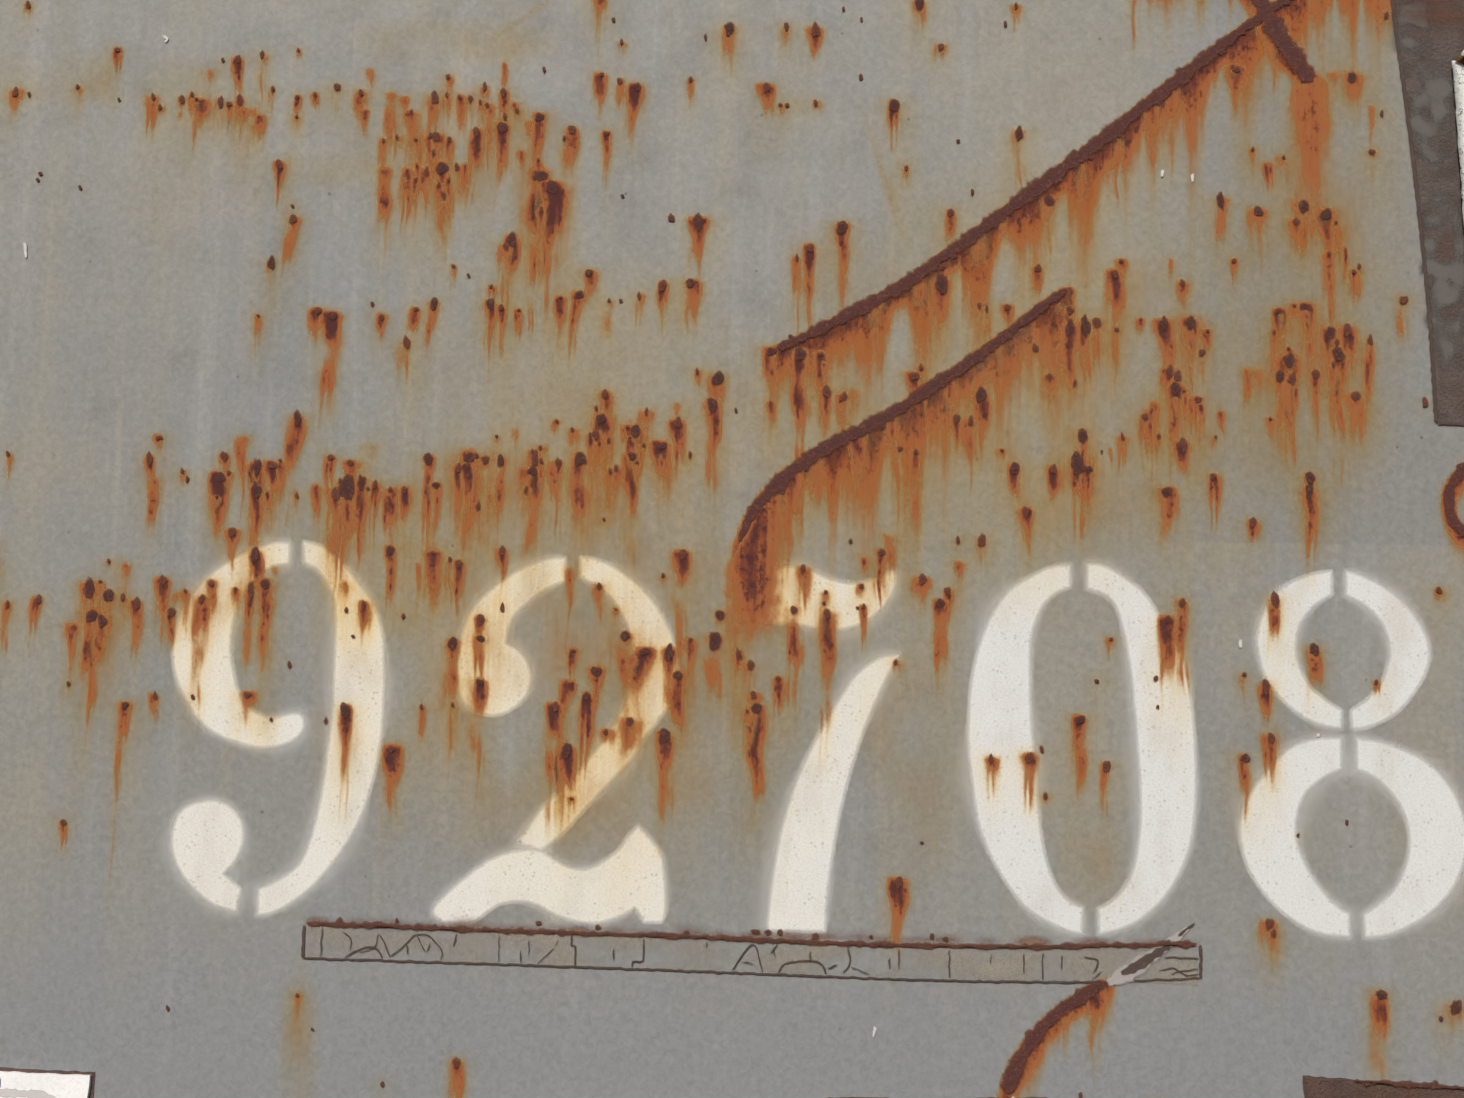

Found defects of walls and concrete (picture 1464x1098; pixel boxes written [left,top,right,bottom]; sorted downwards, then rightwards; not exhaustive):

rust [324,702,353,775]
rust [65,368,737,719]
rust [444,602,504,747]
rust [294,62,709,353]
rust [545,564,836,816]
spalling [738,289,1066,541]
spalling [777,0,1315,351]
rust [1043,258,1225,535]
rust [1153,598,1188,681]
rust [1243,72,1383,556]
peeling [1391,0,1464,426]
spalling [1443,463,1464,537]